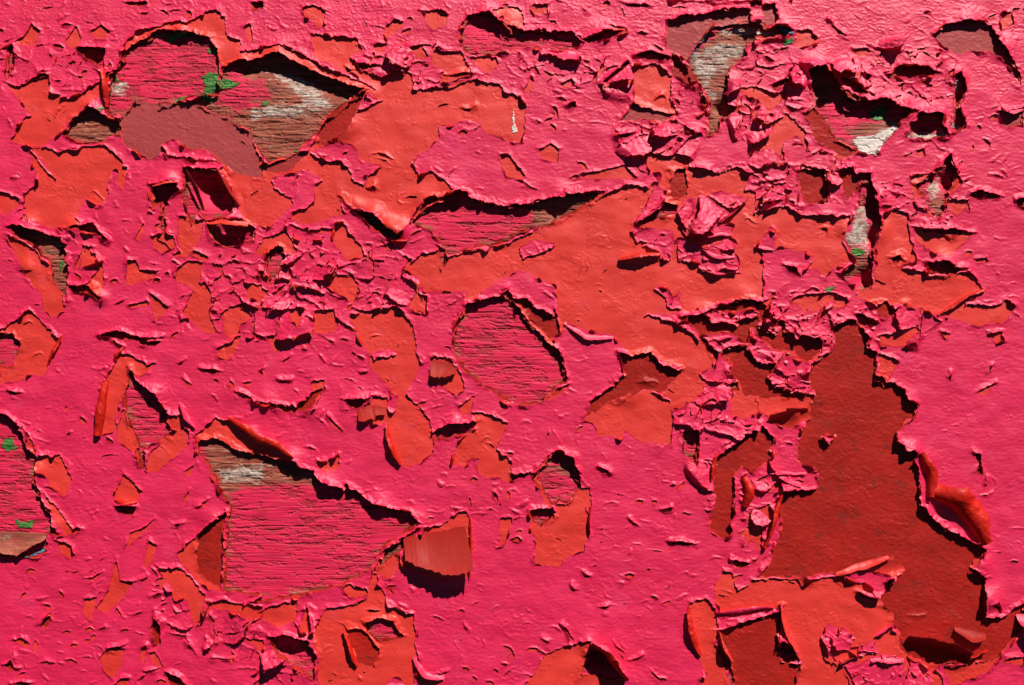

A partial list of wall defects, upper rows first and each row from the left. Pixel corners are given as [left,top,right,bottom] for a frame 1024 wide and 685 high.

peeling [0,406,93,569]
peeling [0,0,390,388]
peeling [74,330,477,685]
peeling [119,0,600,576]
peeling [402,0,1024,685]